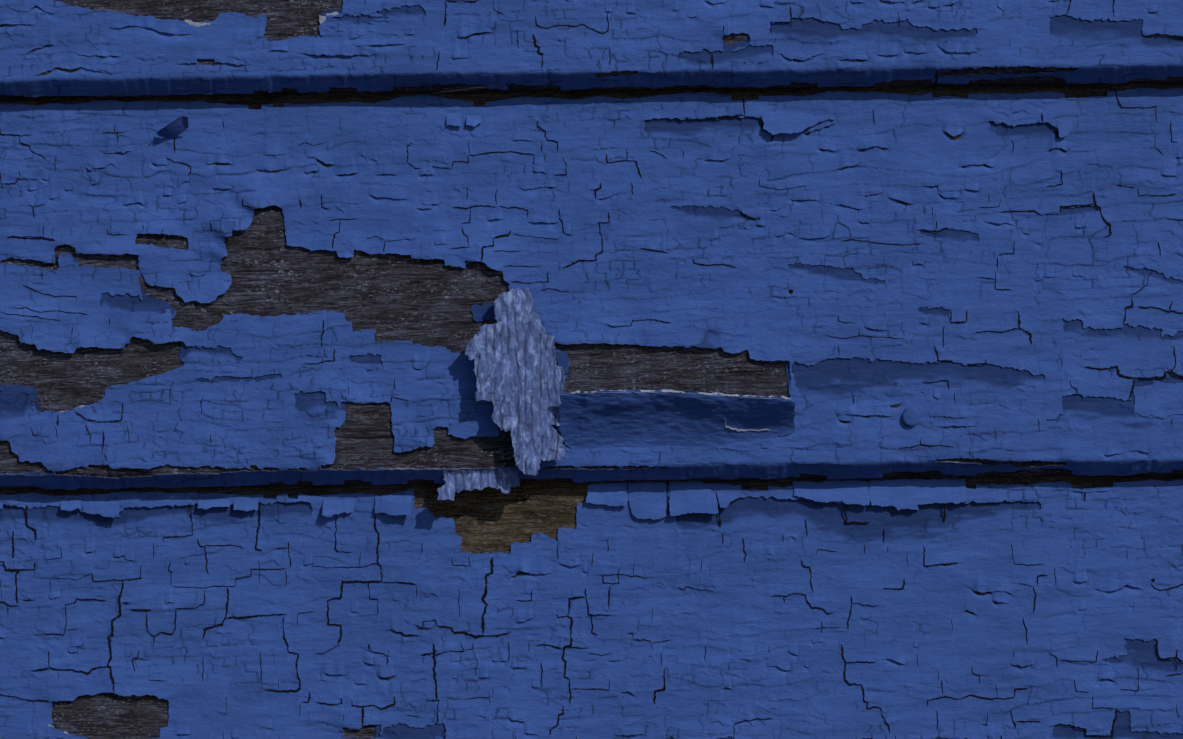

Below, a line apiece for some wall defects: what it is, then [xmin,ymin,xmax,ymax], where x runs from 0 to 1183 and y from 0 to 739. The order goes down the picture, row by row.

peeling [55,0,426,41]
peeling [0,205,1046,554]
crack [407,120,684,292]
crack [640,248,736,268]
crack [926,241,1032,403]
crack [983,169,1183,324]
crack [1061,346,1183,399]
peeling [935,458,1068,473]
peeling [48,692,169,739]
crack [0,501,668,739]
crack [772,502,956,739]
crack [917,543,1183,739]